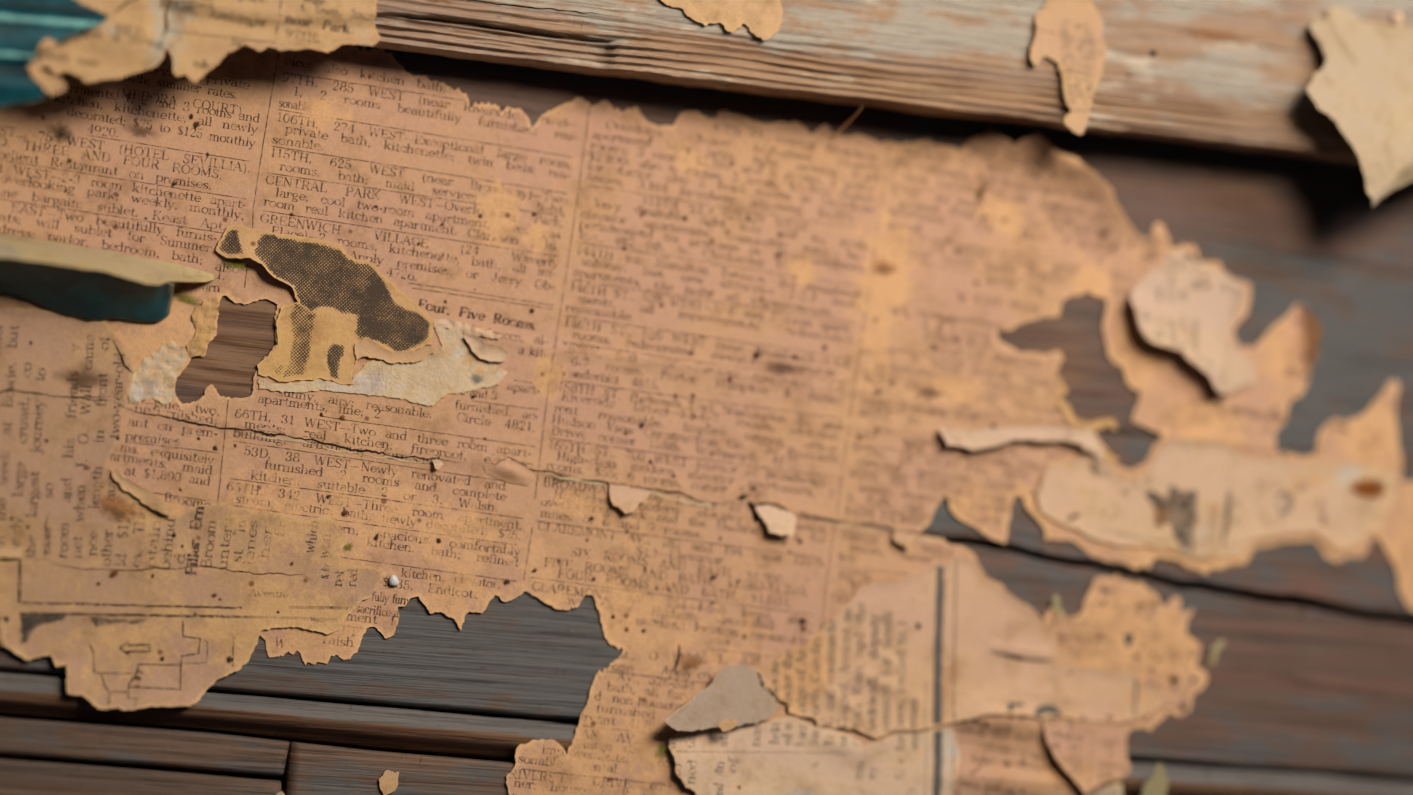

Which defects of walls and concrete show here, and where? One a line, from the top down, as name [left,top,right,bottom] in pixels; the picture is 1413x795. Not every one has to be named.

crack [113,341,132,373]
peeling [187,297,219,357]
peeling [1054,372,1119,462]
crack [0,389,1413,626]
corrosion [1350,478,1385,498]